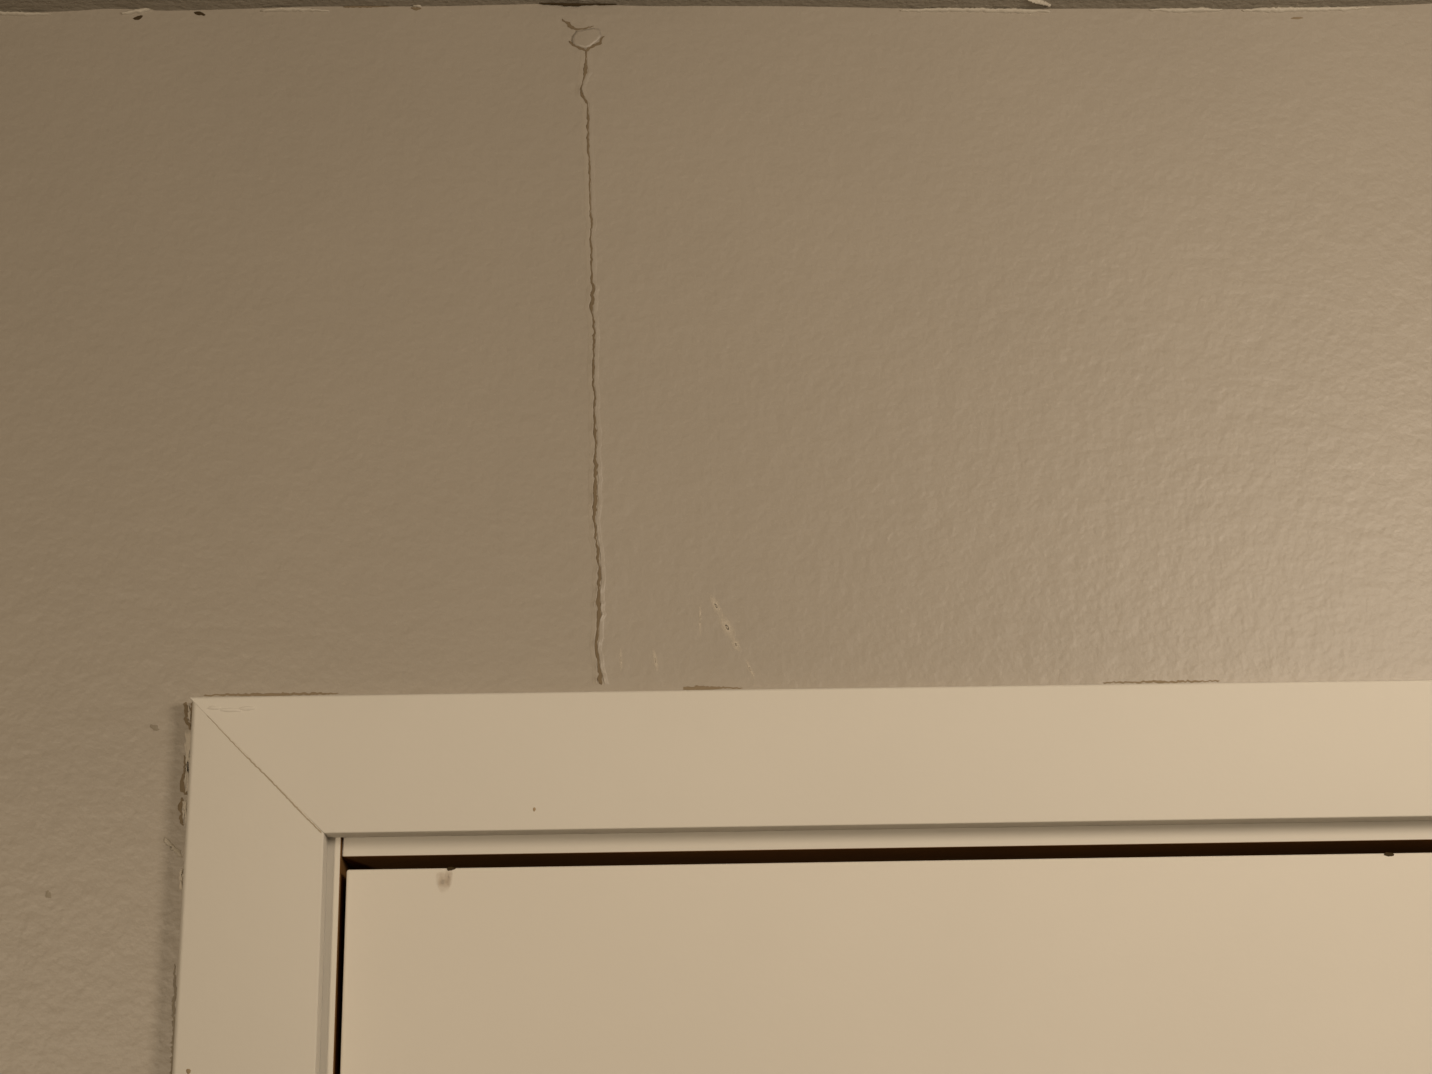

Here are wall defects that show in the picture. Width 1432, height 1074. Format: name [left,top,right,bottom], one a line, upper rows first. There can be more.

crack [540,0,617,685]